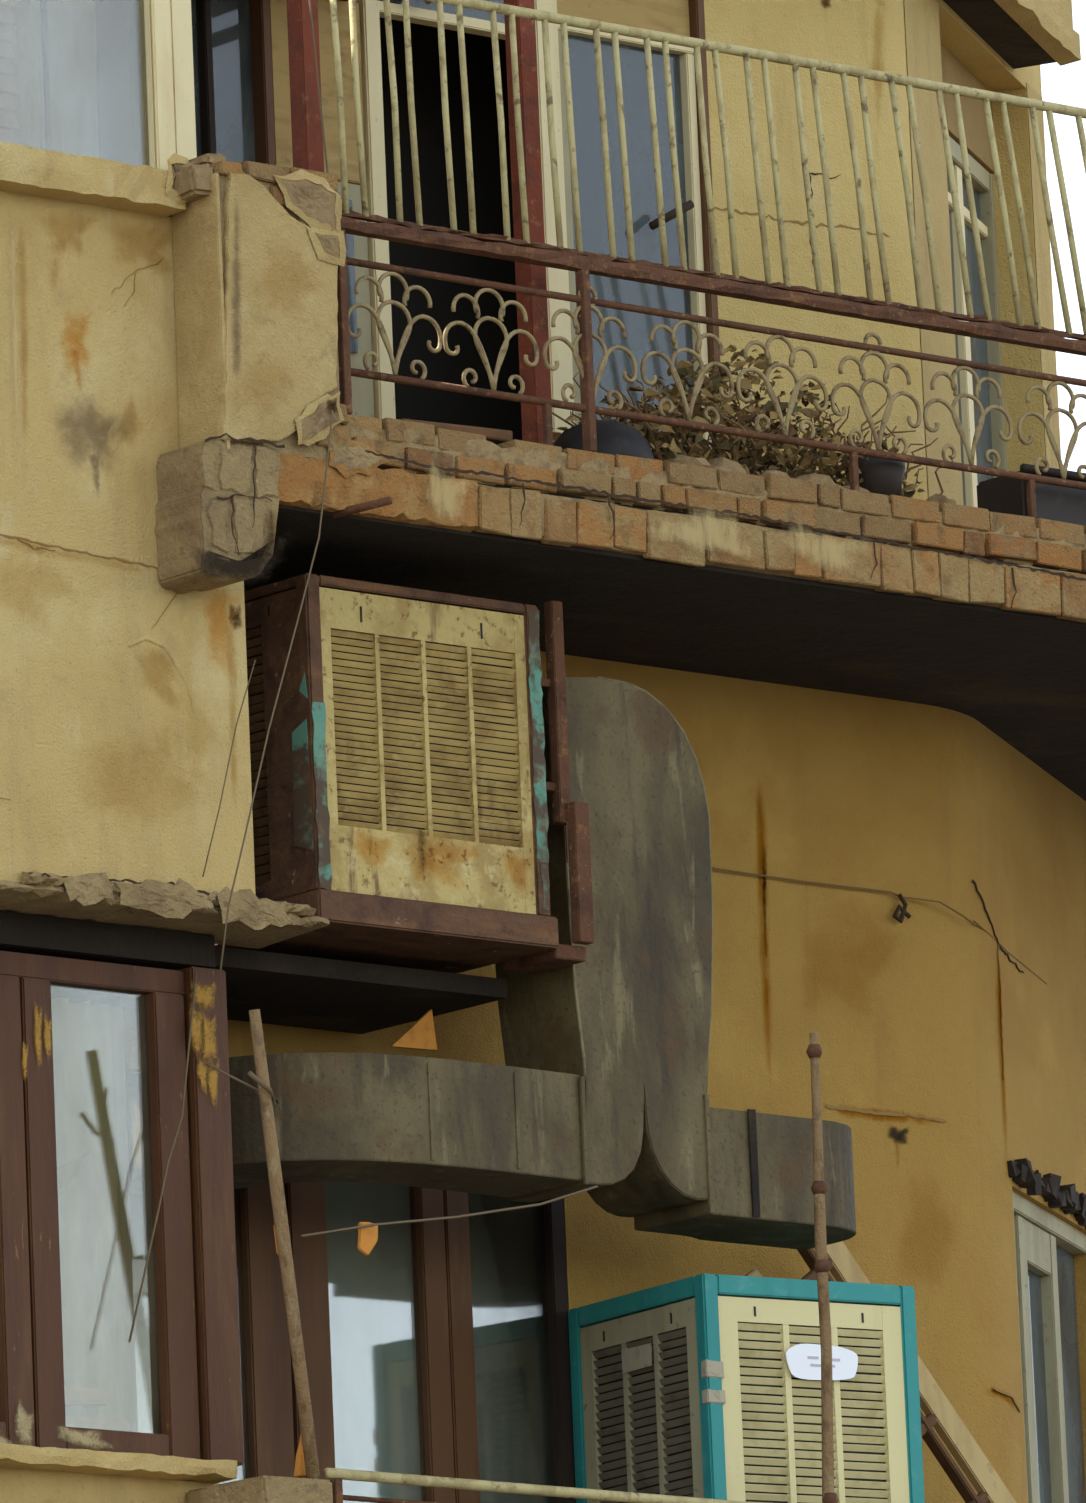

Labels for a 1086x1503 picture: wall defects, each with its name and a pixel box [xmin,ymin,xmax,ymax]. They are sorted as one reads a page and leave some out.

spalling [165,153,346,266]
crack [714,172,889,263]
crack [0,534,177,629]
spalling [29,872,294,930]